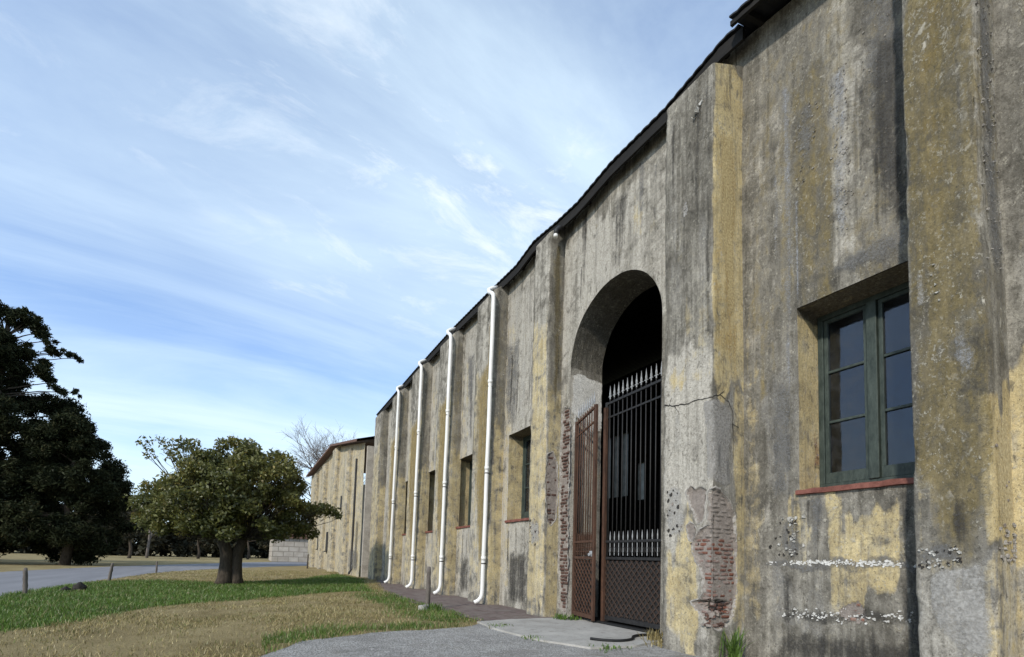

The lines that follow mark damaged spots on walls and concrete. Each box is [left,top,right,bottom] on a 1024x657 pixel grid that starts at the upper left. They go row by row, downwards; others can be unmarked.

leakage [874,42,906,218]
spalling [529,406,571,614]
crack [664,391,739,457]
spalling [667,485,738,632]